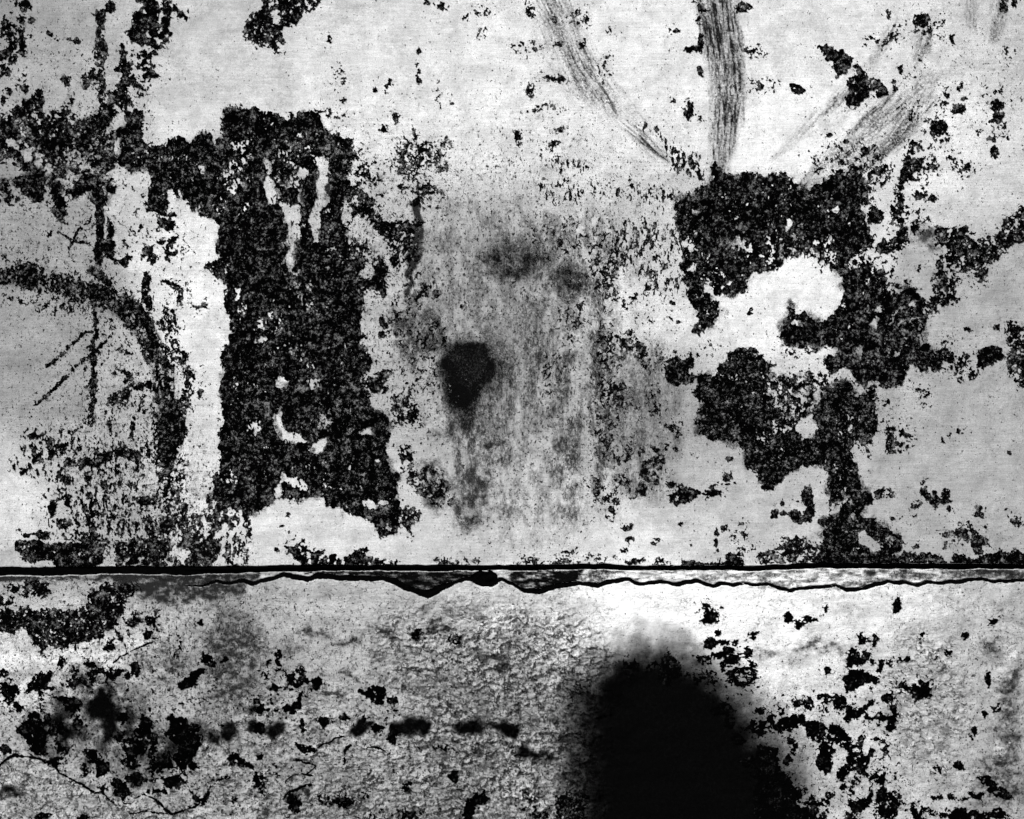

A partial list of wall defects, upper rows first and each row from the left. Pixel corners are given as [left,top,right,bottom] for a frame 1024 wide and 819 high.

peeling [0,73,45,122]
peeling [55,67,99,107]
peeling [105,0,116,14]
peeling [815,43,889,110]
peeling [111,54,454,539]
leakage [278,118,1024,590]
peeling [613,158,1024,564]
crack [0,562,1024,599]
peeling [0,568,631,819]
leakage [600,647,815,819]
peeling [691,594,1014,819]